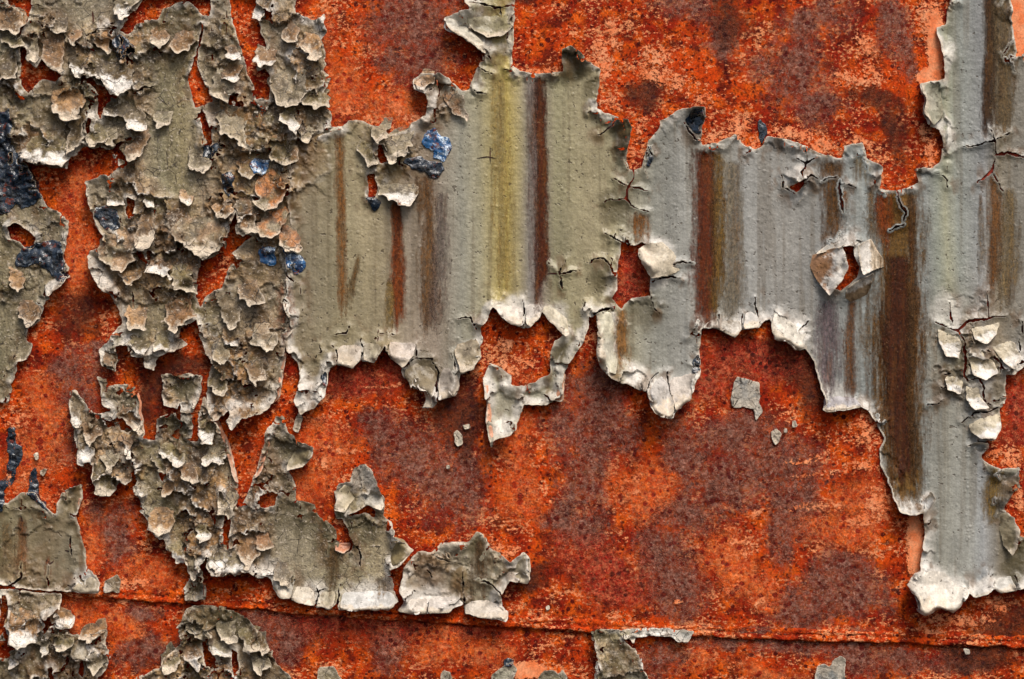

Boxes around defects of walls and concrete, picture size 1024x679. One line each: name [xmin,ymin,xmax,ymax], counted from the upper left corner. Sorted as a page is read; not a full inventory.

peeling [0,0,414,612]
corrosion [359,371,487,528]
corrosion [528,78,549,304]
crack [604,168,648,211]
peeling [281,0,1024,622]
corrosion [691,149,744,330]
corrosion [495,176,1024,679]
crack [782,149,853,211]
crack [927,293,1023,446]
crack [963,130,1024,191]
peeling [0,484,121,679]
peeling [136,605,291,679]